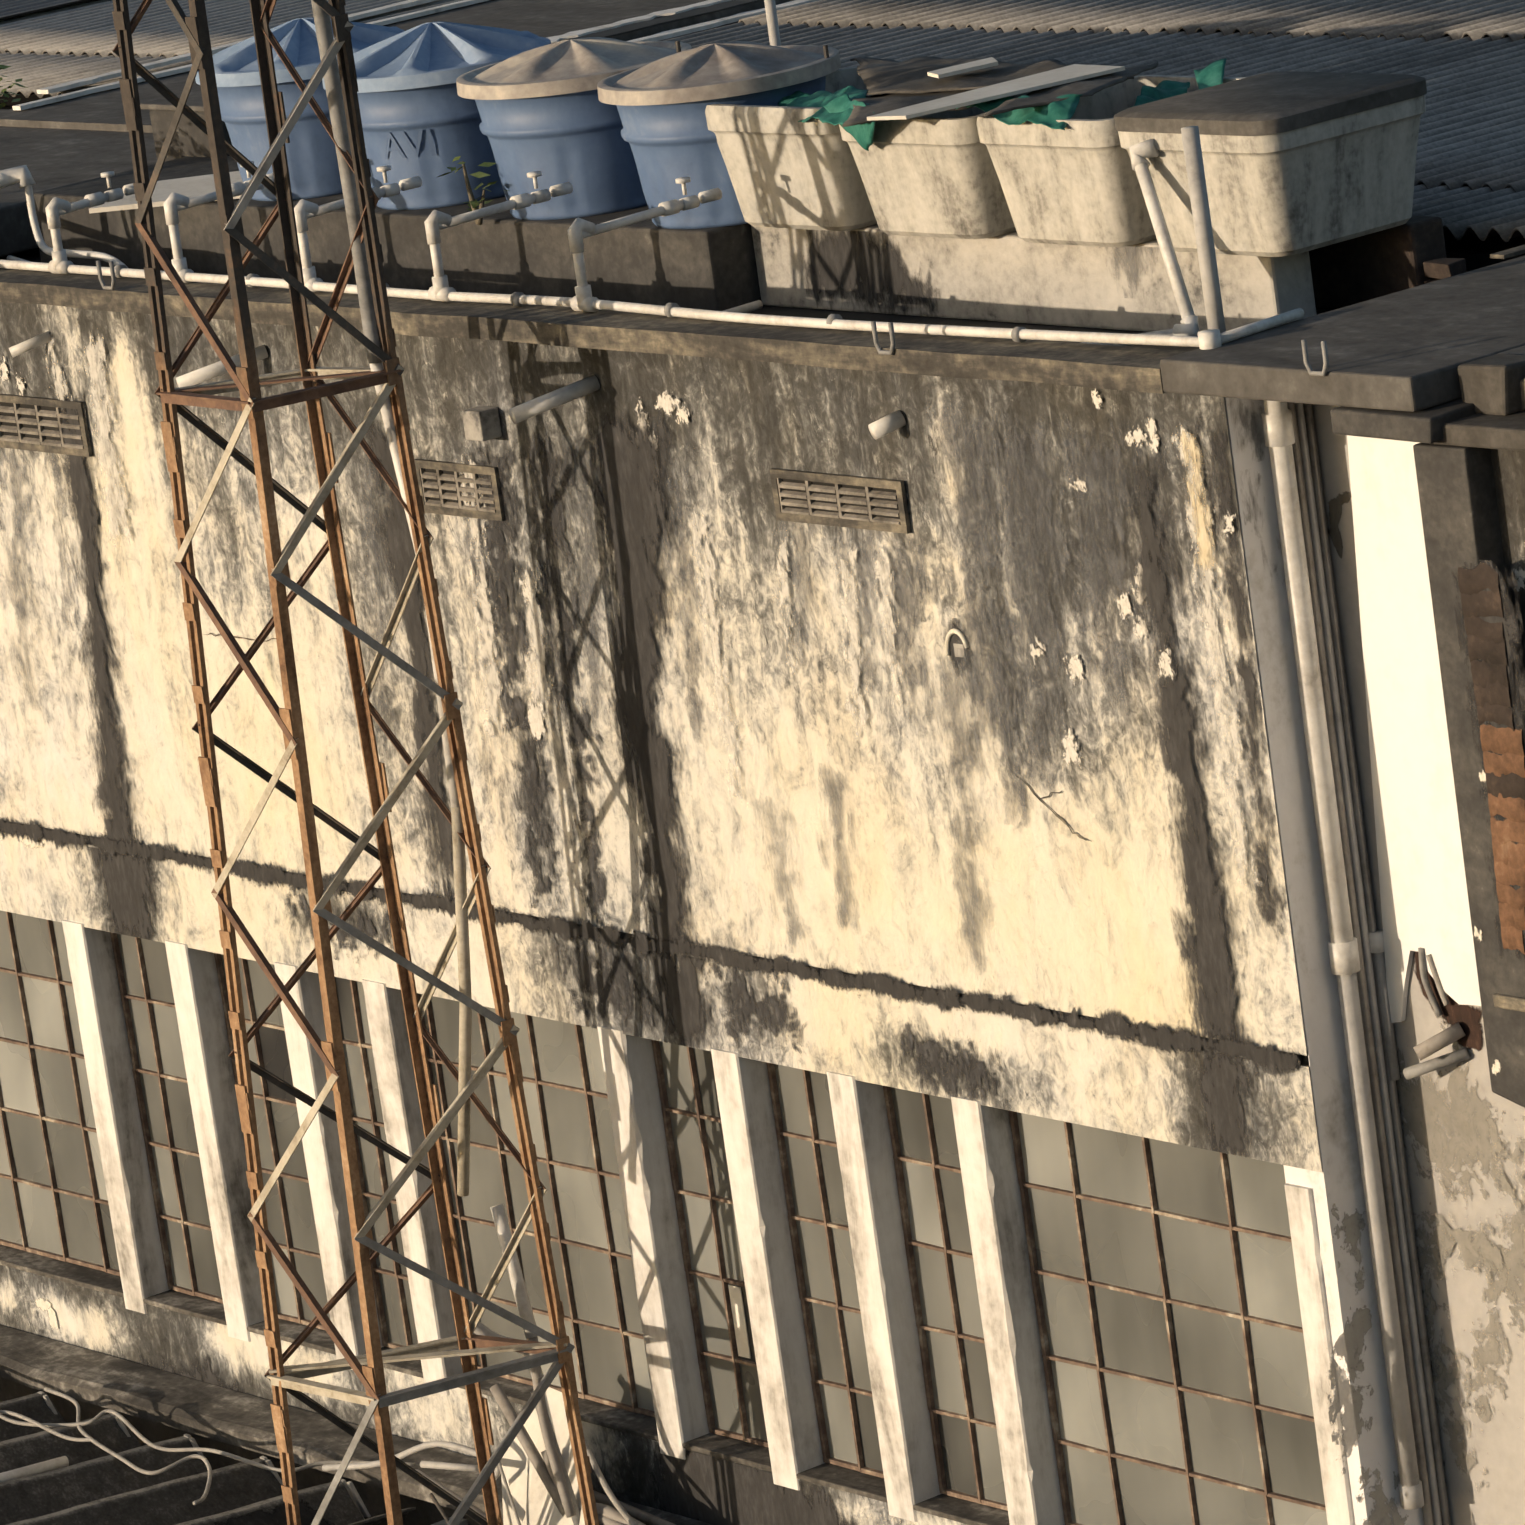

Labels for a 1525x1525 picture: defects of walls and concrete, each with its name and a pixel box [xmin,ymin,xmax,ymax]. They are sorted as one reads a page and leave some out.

water stain [803,229,937,315]
water stain [1114,246,1153,285]
water stain [0,335,1300,1158]
spalling [1454,560,1525,955]
peeling [1396,948,1525,1489]